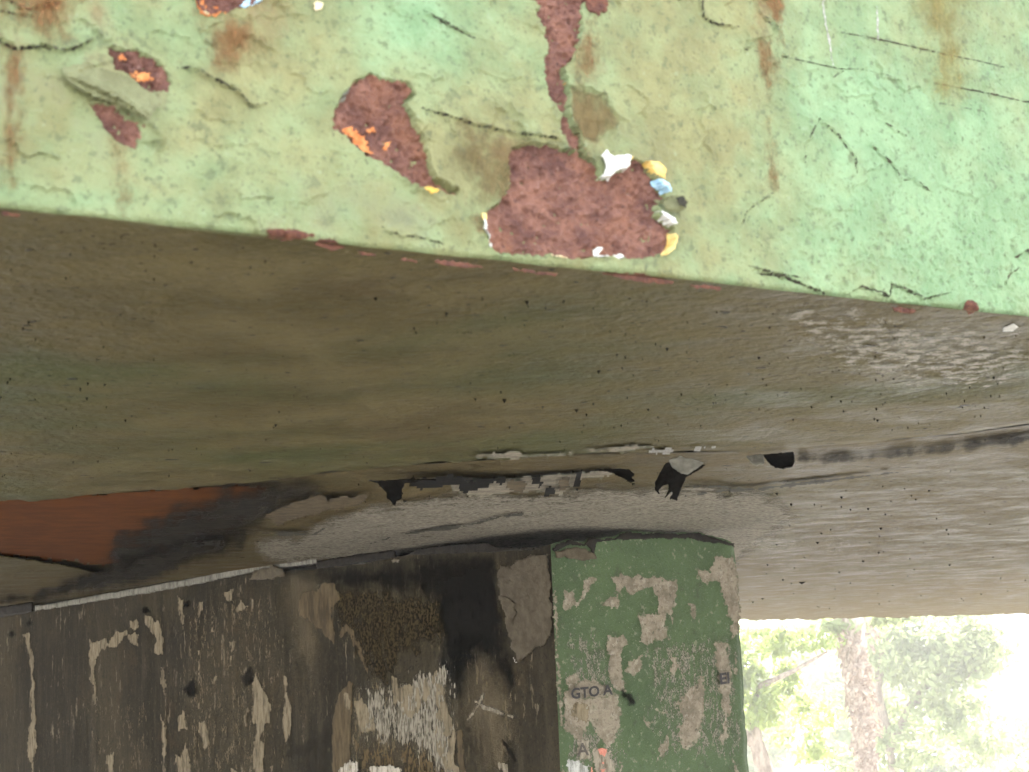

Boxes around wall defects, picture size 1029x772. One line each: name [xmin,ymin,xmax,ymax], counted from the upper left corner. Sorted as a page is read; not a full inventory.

corrosion [766,0,784,21]
peeling [62,61,162,120]
peeling [572,89,615,141]
crack [804,118,933,192]
leakage [336,584,501,686]
peeling [257,444,795,772]